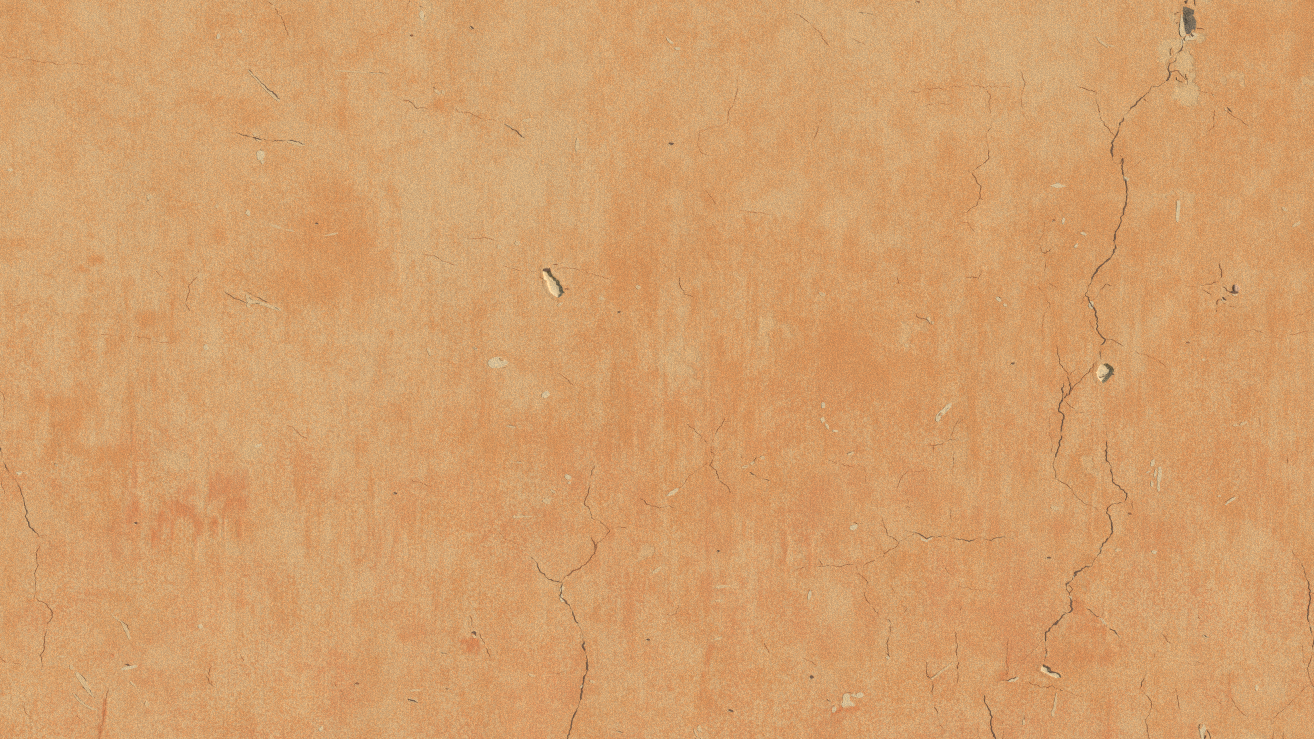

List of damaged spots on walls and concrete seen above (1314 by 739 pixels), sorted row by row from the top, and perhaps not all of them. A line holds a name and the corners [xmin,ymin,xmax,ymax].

peeling [1150,0,1214,113]
spalling [539,263,568,307]
crack [795,37,1247,739]
spalling [1092,359,1119,388]
crack [640,419,732,508]
crack [0,447,53,667]
crack [500,465,626,739]